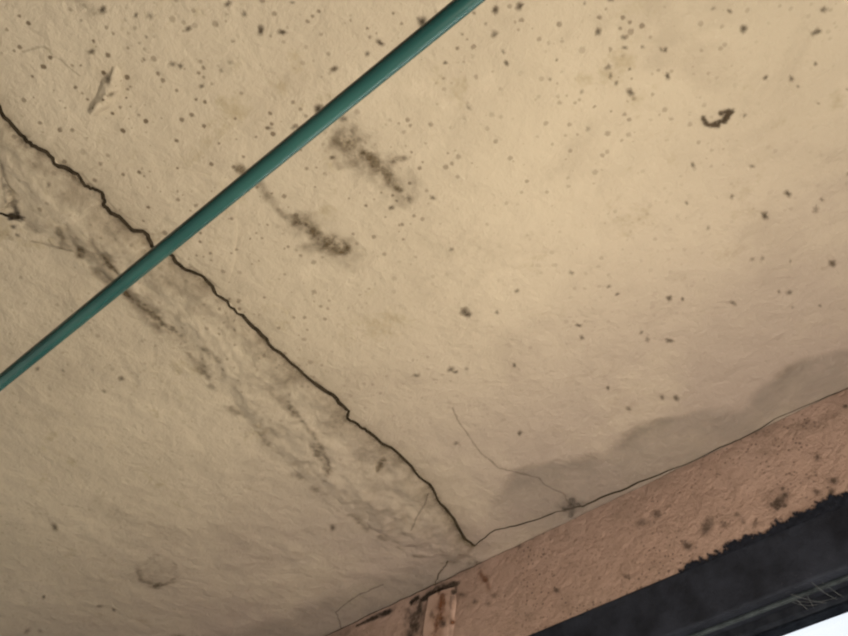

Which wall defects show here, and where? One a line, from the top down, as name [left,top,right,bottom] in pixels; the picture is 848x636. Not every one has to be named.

spalling [0,166,23,236]
crack [0,105,154,248]
leakage [293,217,351,255]
leakage [333,136,404,192]
crack [59,231,174,330]
crack [169,254,848,636]
leakage [407,581,458,636]